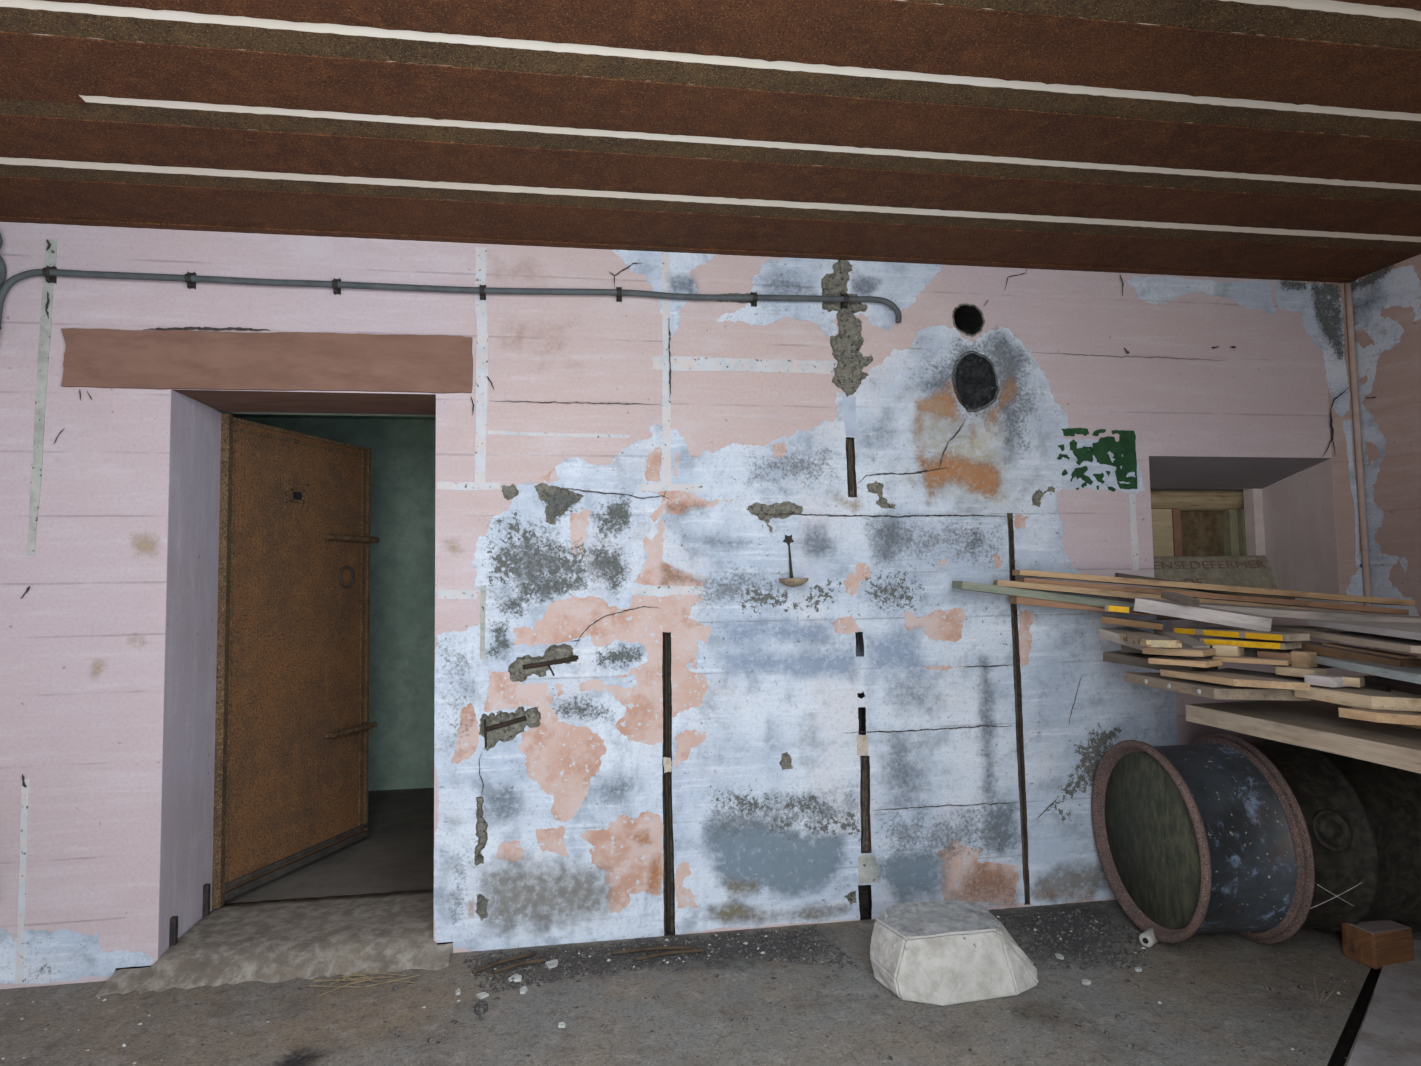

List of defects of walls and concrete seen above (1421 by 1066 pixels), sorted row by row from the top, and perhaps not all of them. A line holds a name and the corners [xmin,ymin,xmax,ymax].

crack [754,419,991,518]
peeling [1127,265,1421,616]
crack [1323,387,1376,456]
leakage [489,489,632,659]
crack [571,606,657,645]
peeling [434,250,1178,951]
leakage [486,870,603,929]